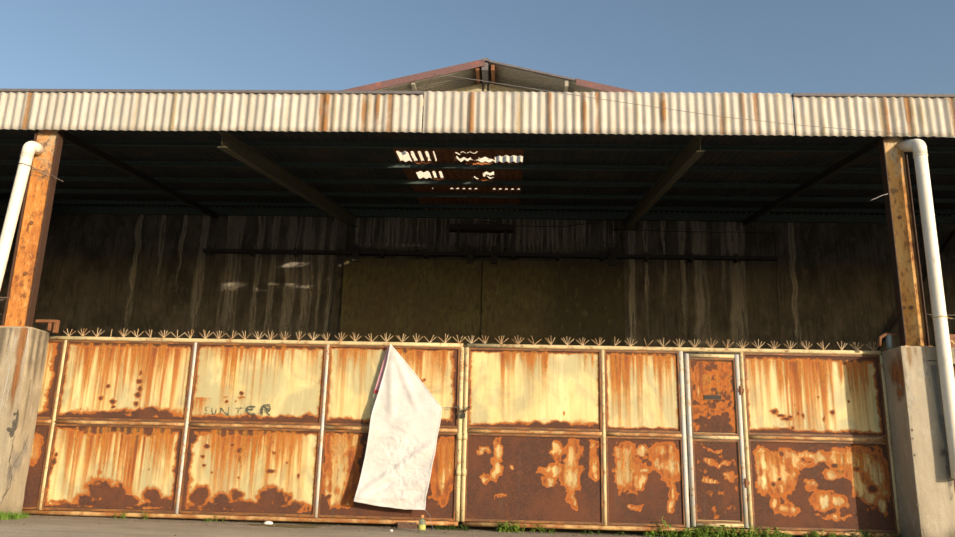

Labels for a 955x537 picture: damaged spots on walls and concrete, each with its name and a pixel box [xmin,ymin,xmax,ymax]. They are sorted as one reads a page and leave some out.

rust [362,94,393,132]
leakage [217,216,246,338]
leakage [250,216,338,341]
leakage [628,221,649,344]
leakage [678,221,710,348]
leakage [720,221,746,355]
crack [0,435,29,504]
rust [23,342,458,518]
rust [466,350,683,525]
rust [691,360,741,521]
rust [745,355,895,530]
rust [892,360,904,397]